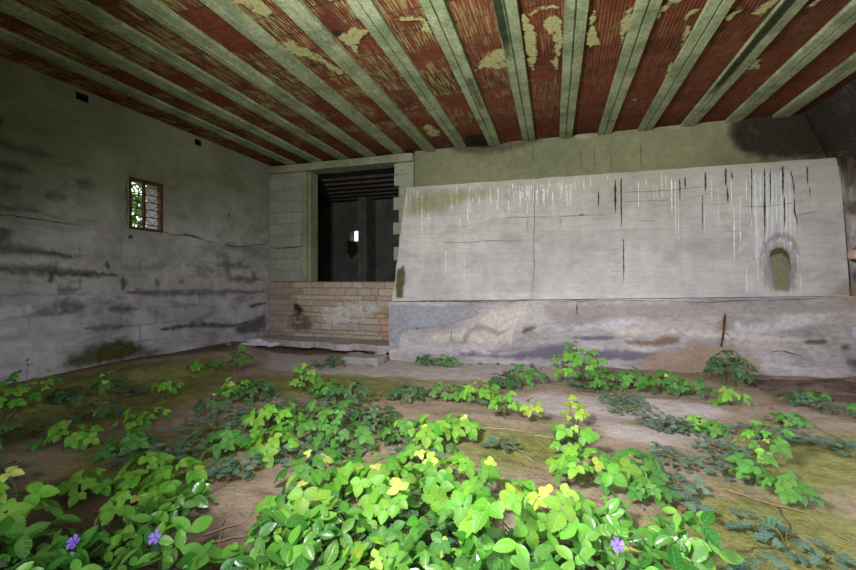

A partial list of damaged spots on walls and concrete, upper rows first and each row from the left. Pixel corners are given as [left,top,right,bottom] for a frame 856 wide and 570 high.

peeling [234,0,272,17]
peeling [395,16,432,34]
peeling [278,40,343,75]
peeling [332,27,368,54]
peeling [478,48,507,69]
peeling [522,5,564,86]
leakage [702,77,856,290]
leakage [607,176,686,240]
crack [165,232,307,249]
leakage [161,303,266,333]
leakage [492,336,613,359]
leakage [587,351,656,360]